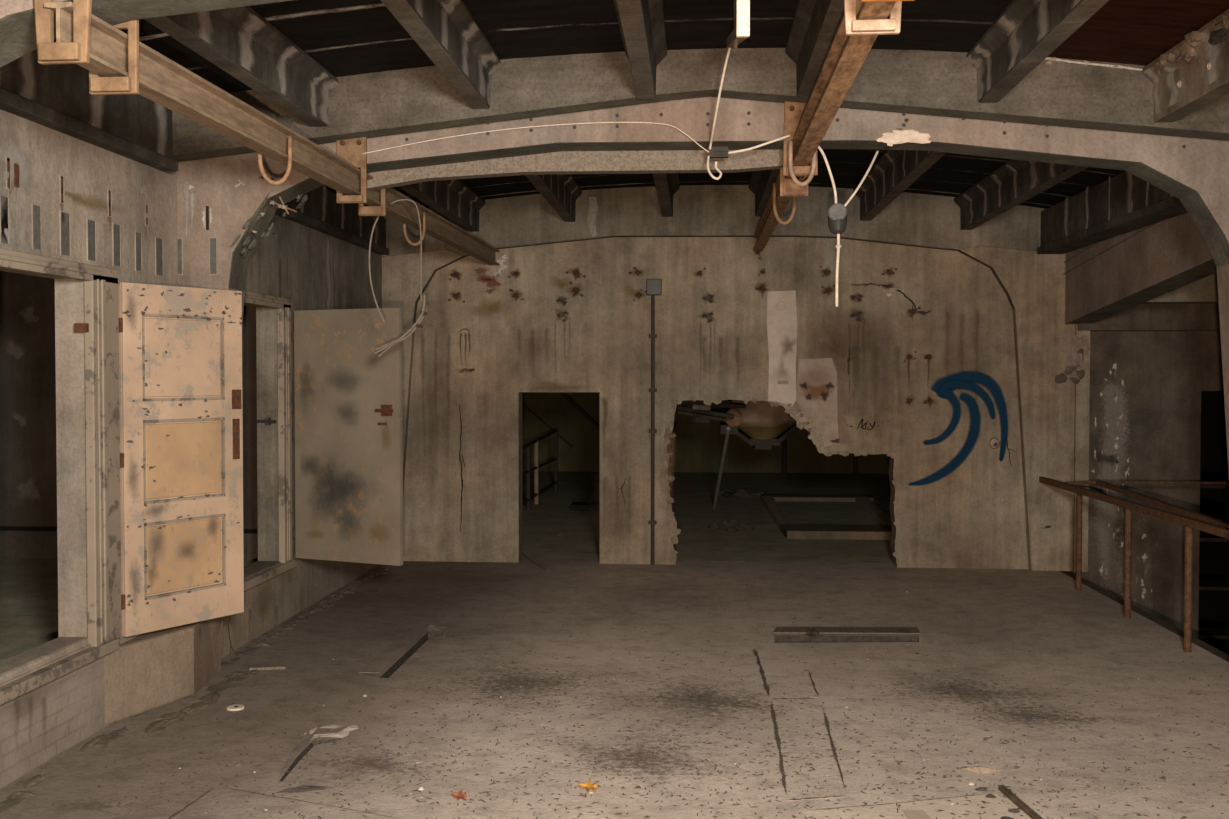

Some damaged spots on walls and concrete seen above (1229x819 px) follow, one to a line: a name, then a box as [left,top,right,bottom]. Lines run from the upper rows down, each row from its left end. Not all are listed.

spalling [1157,14,1229,74]
rust [566,270,585,297]
spalling [743,394,868,456]
spalling [663,395,722,555]